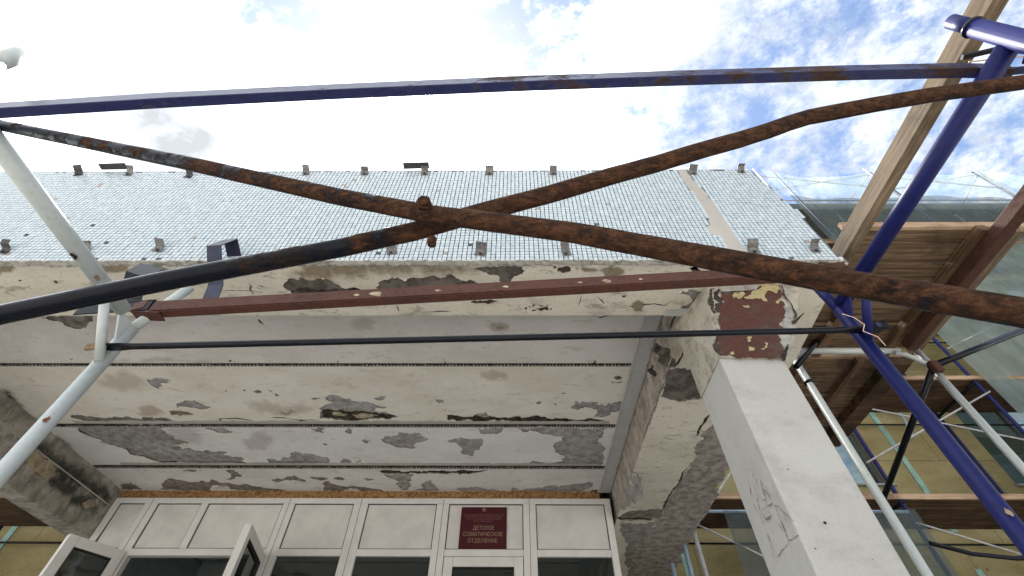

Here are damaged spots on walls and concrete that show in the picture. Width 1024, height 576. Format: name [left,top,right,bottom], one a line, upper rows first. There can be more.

spalling [284,277,361,293]
spalling [377,265,525,289]
spalling [678,284,804,361]
peeling [147,378,170,388]
spalling [647,343,701,401]
peeling [72,395,497,491]
peeling [448,401,622,464]
spalling [615,415,730,576]